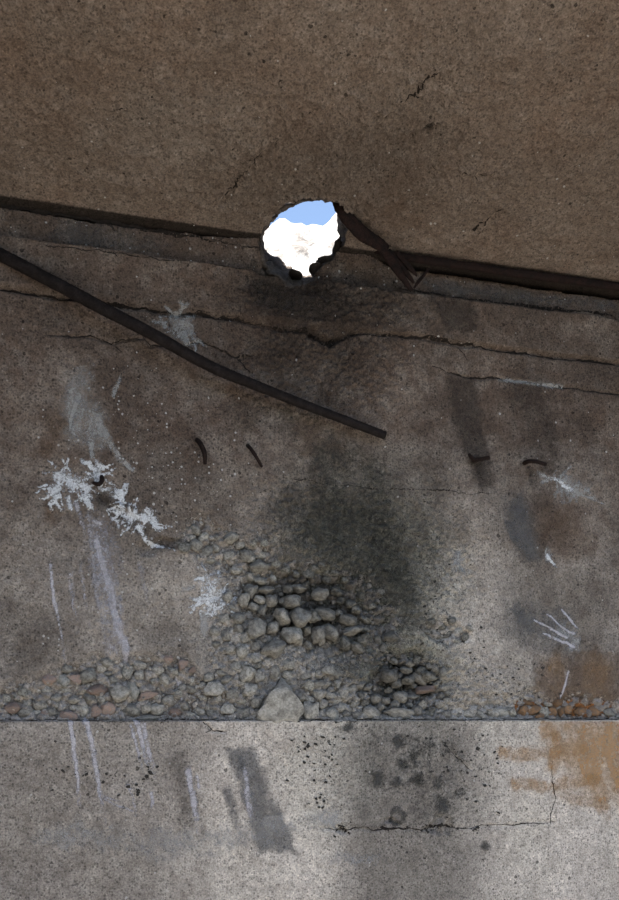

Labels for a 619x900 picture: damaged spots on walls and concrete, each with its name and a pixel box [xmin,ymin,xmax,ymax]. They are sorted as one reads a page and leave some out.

crack [0,289,76,302]
crack [403,289,615,317]
crack [48,335,162,352]
crack [107,302,619,395]
water stain [35,379,175,663]
corrosion [531,647,619,804]
crack [325,756,556,834]